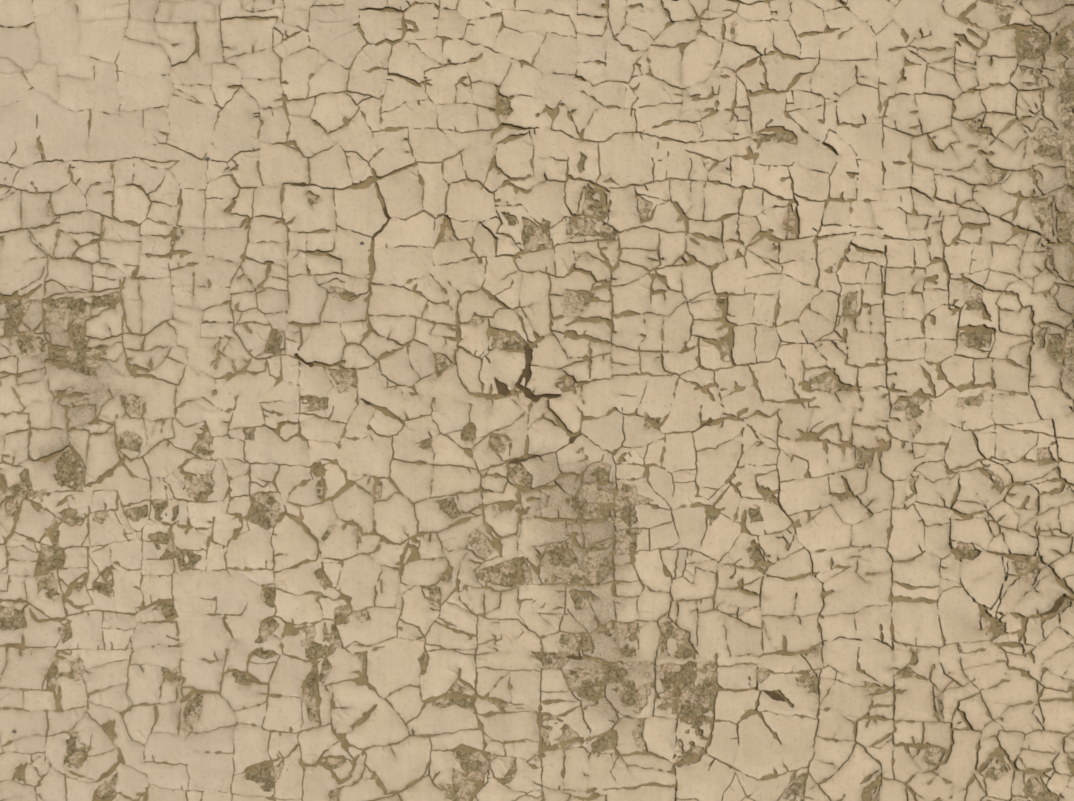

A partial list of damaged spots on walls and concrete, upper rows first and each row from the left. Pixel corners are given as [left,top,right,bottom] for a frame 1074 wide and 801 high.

crack [162,22,211,104]
crack [363,53,483,106]
crack [454,10,577,117]
crack [577,0,716,61]
crack [833,0,1074,152]
crack [812,129,838,155]
peeling [845,0,1074,400]
crack [293,242,352,286]
crack [895,309,936,350]
peeling [0,166,1074,801]
crack [0,636,116,801]
crack [58,736,150,801]